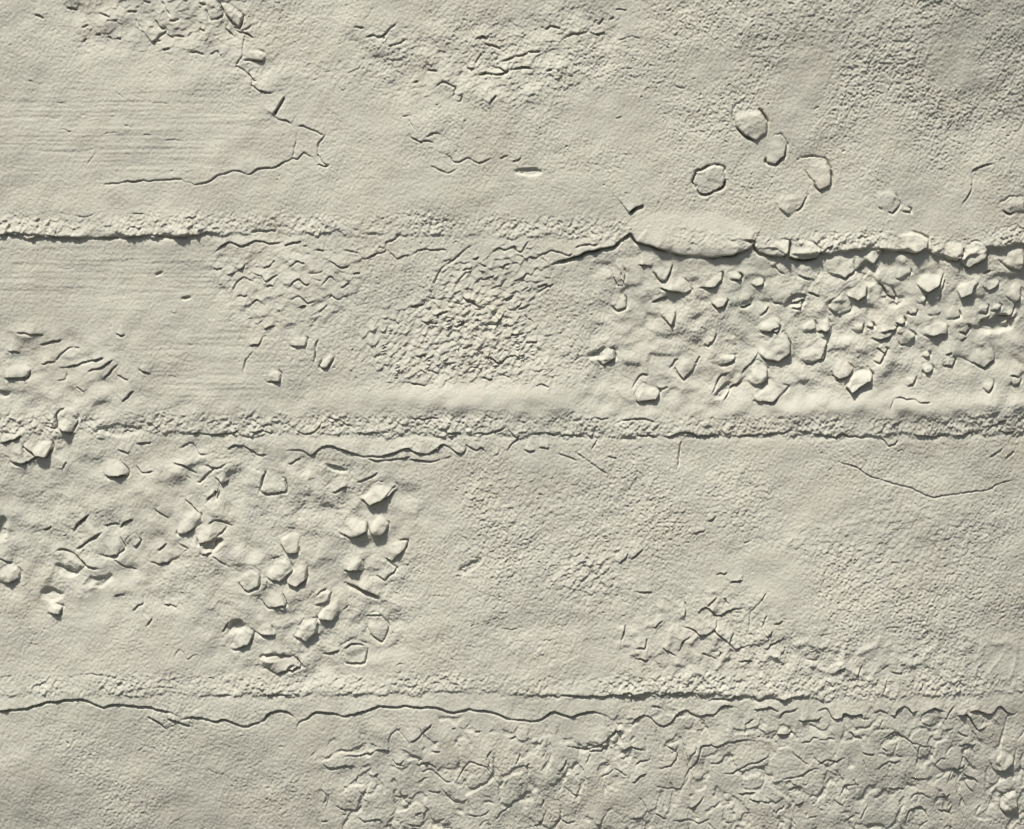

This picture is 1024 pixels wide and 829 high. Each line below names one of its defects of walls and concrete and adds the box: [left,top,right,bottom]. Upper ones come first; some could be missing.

crack [85,2,331,189]
flaking render [692,163,728,197]
flaking render [732,102,834,218]
crack [0,227,304,255]
crack [341,203,819,289]
spalling [208,239,1024,417]
crack [186,395,1021,501]
spalling [0,327,421,683]
crack [0,690,1021,755]